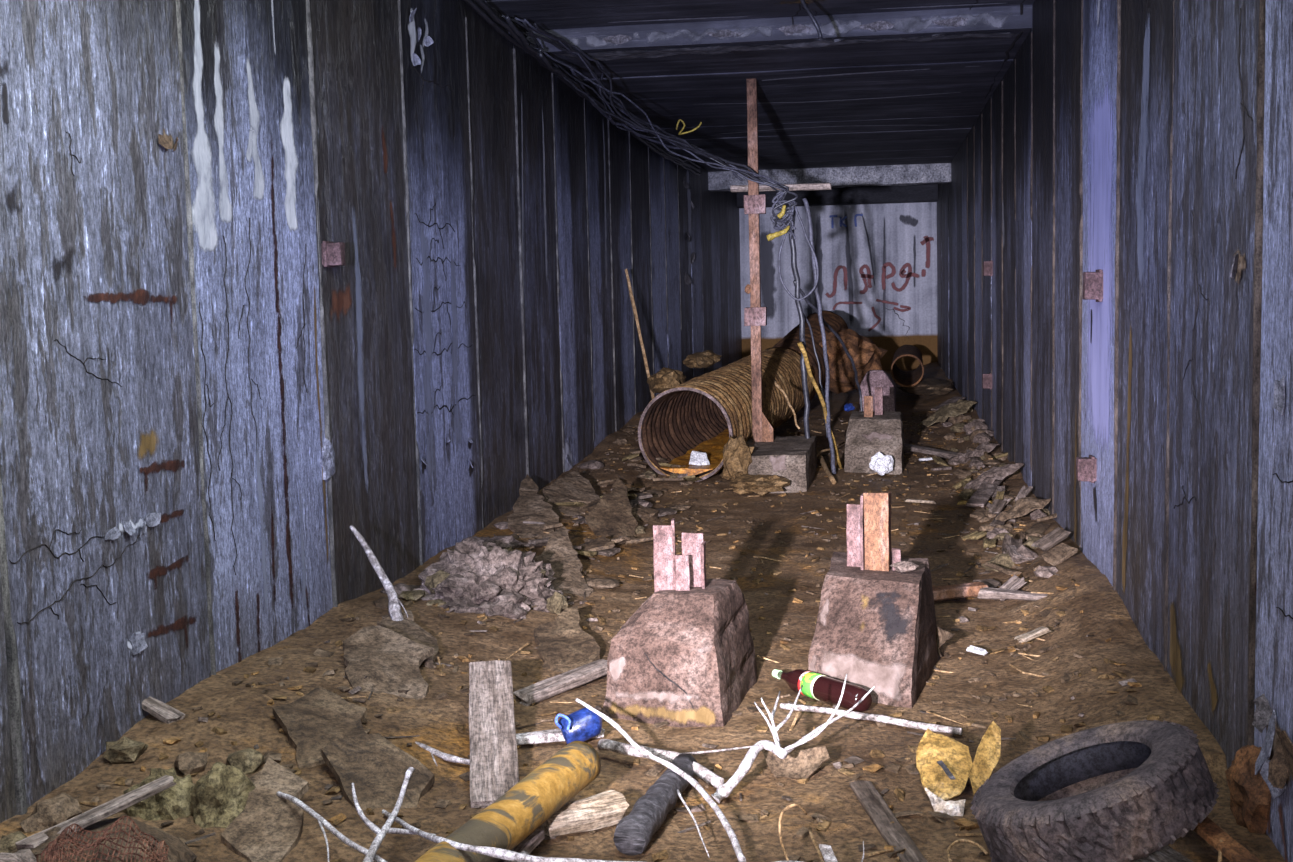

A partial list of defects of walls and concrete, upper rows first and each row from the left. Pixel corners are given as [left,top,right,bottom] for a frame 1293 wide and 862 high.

spalling [408,8,434,73]
leakage [192,0,232,251]
leakage [246,60,264,199]
leakage [280,78,298,230]
corrosion [83,289,177,322]
crack [415,203,475,418]
crack [9,529,139,624]
corrosion [147,555,189,589]
corrosion [148,615,196,648]